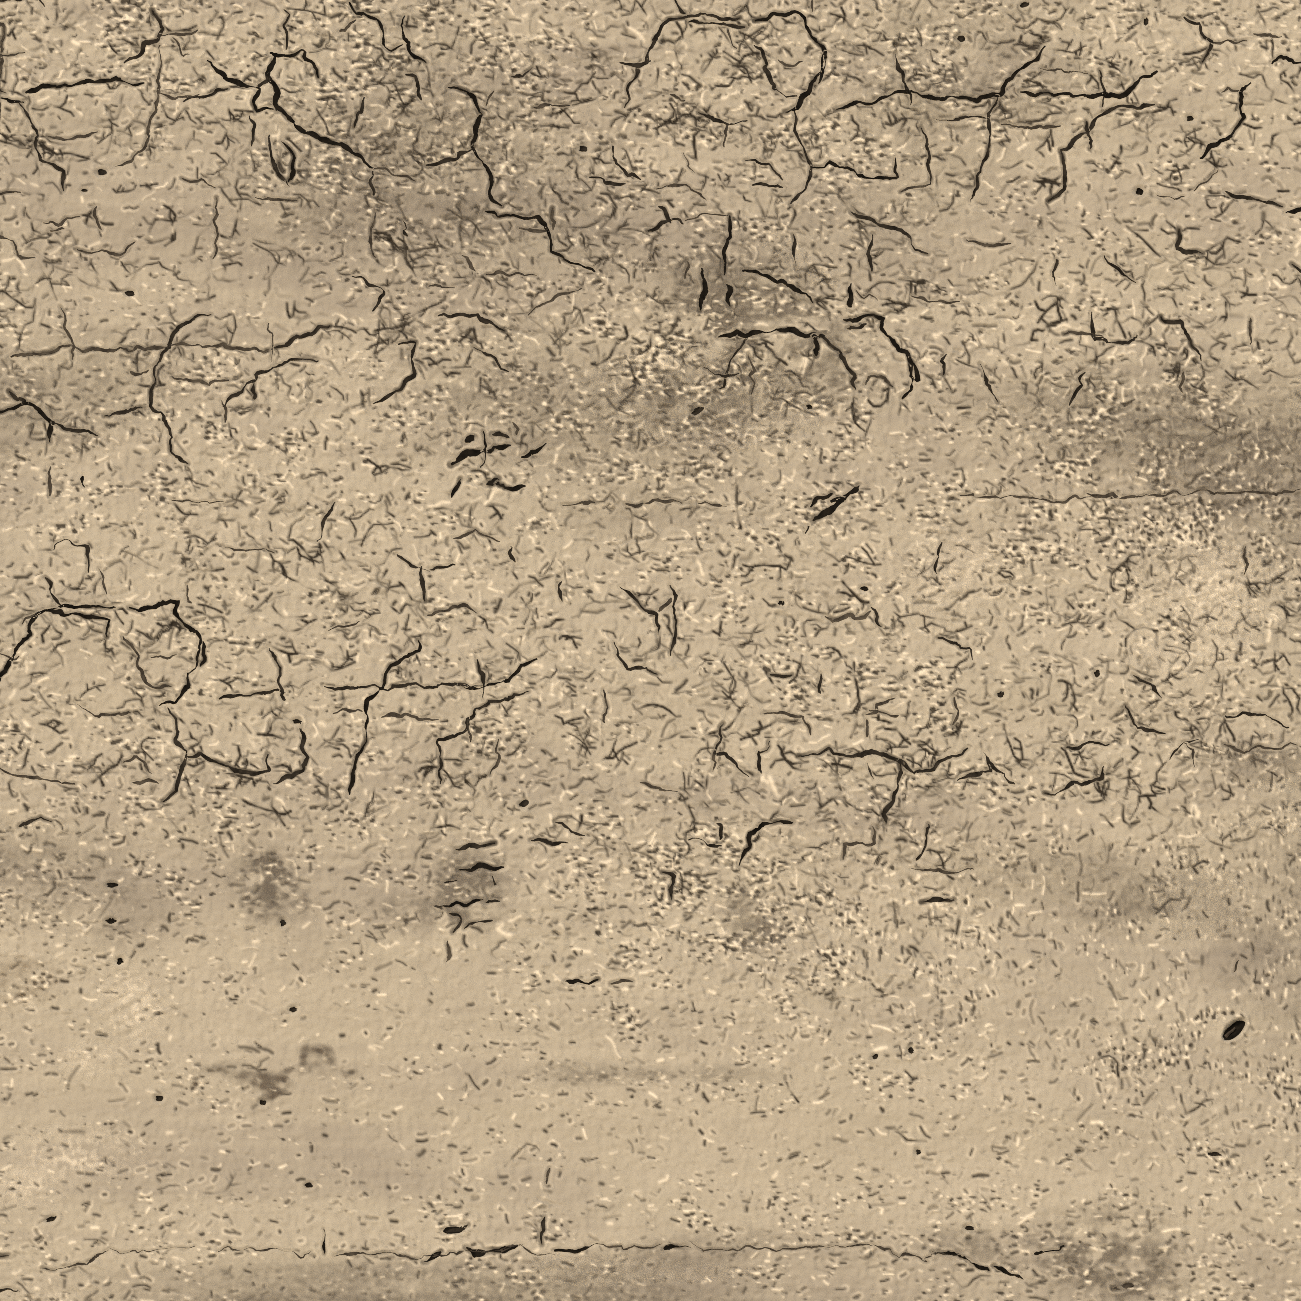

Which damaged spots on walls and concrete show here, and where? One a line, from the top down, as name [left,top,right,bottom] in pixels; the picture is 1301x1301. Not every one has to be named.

crack [0,0,595,372]
crack [589,0,1158,405]
crack [1157,17,1301,255]
crack [0,307,330,496]
crack [1064,312,1202,392]
crack [0,539,309,802]
crack [324,529,537,795]
crack [602,585,678,723]
crack [688,820,793,865]
crack [712,674,1015,859]
crack [1125,675,1297,767]
crack [44,1217,1064,1279]